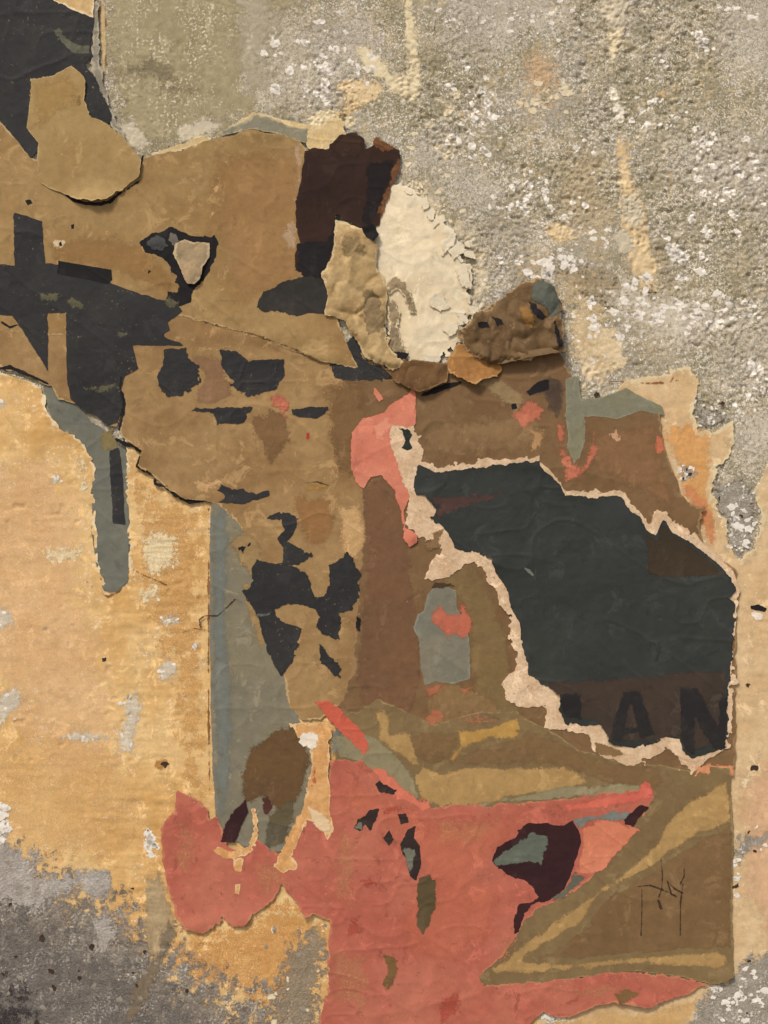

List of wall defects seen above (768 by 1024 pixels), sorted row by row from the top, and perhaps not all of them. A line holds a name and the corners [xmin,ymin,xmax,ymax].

damp [226,0,423,130]
damp [435,0,585,109]
damp [596,0,631,69]
damp [608,87,625,124]
damp [702,0,768,91]
damp [409,113,506,225]
damp [509,115,768,485]
damp [662,422,717,546]